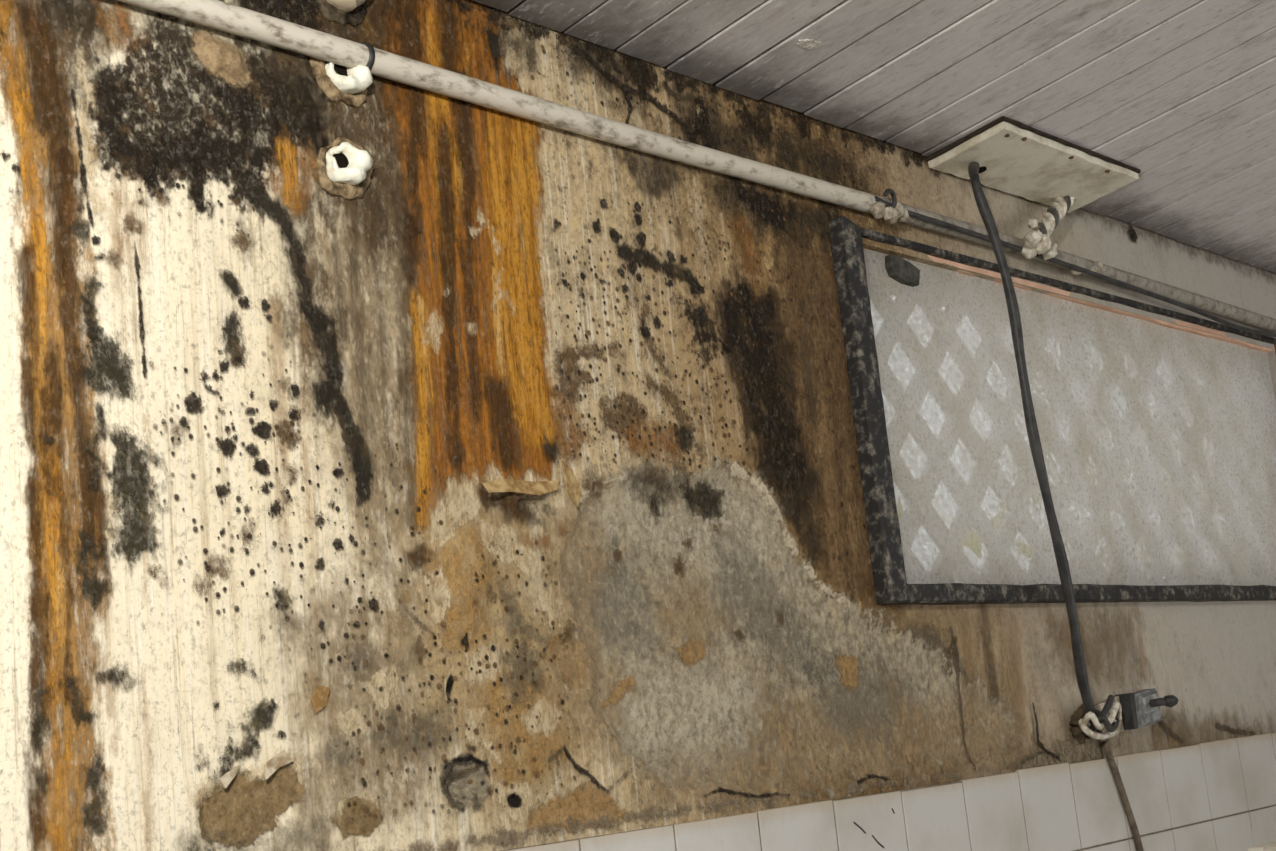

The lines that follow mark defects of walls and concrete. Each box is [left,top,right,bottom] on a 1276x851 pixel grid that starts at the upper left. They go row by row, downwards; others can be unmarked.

rust [372,0,522,93]
rust [0,0,113,851]
damp [1,0,579,819]
rust [377,78,589,532]
damp [551,144,875,595]
damp [81,751,108,840]
peeling [195,750,305,850]
peeling [308,679,330,713]
spalling [331,436,1023,838]